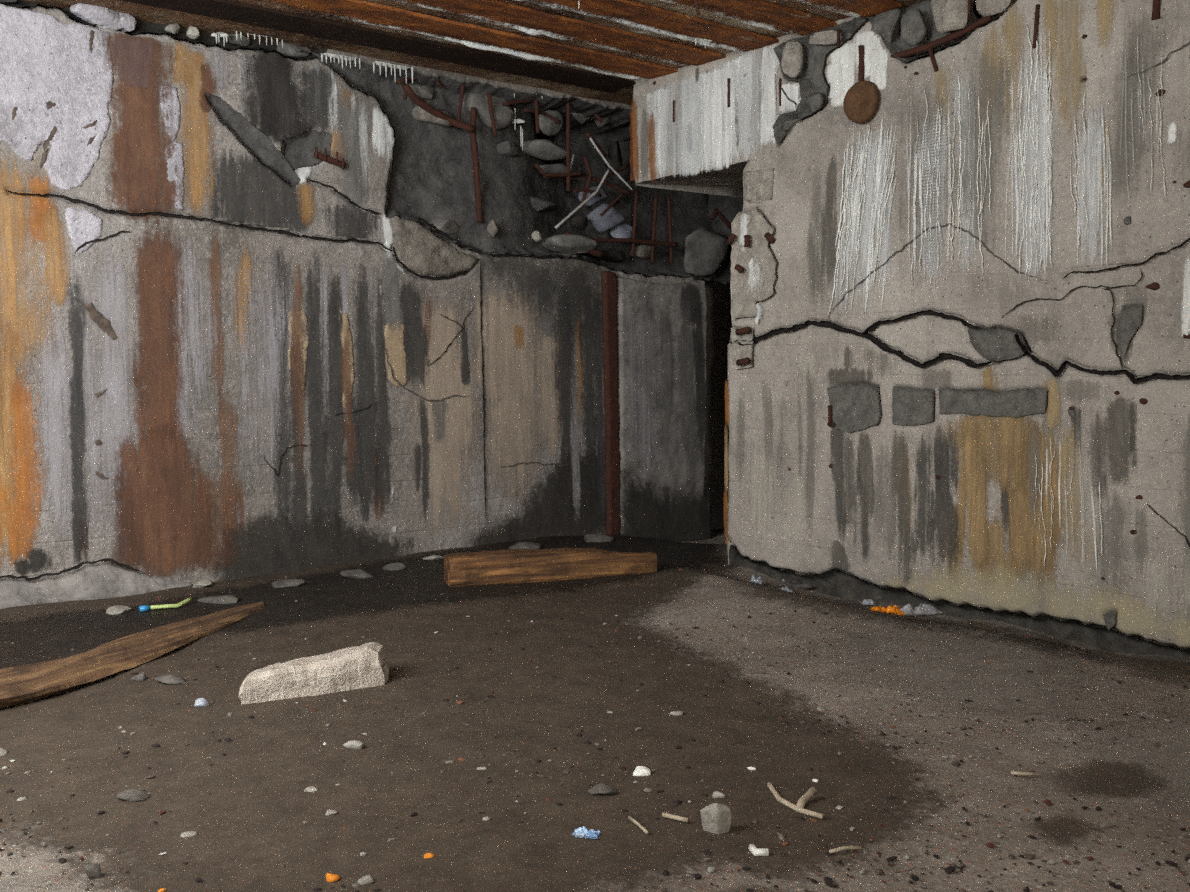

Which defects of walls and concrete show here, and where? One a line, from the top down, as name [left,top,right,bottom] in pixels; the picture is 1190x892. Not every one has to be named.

corrosion [0,168,68,563]
peeling [0,1,113,191]
corrosion [105,33,251,576]
crack [8,179,601,521]
spalling [129,21,777,370]
leakage [548,4,801,176]
spalling [772,0,1017,146]
leakage [808,26,1052,318]
crack [728,223,1190,384]
corrosion [1044,0,1114,130]
crack [0,558,145,581]
leakage [0,534,1190,892]